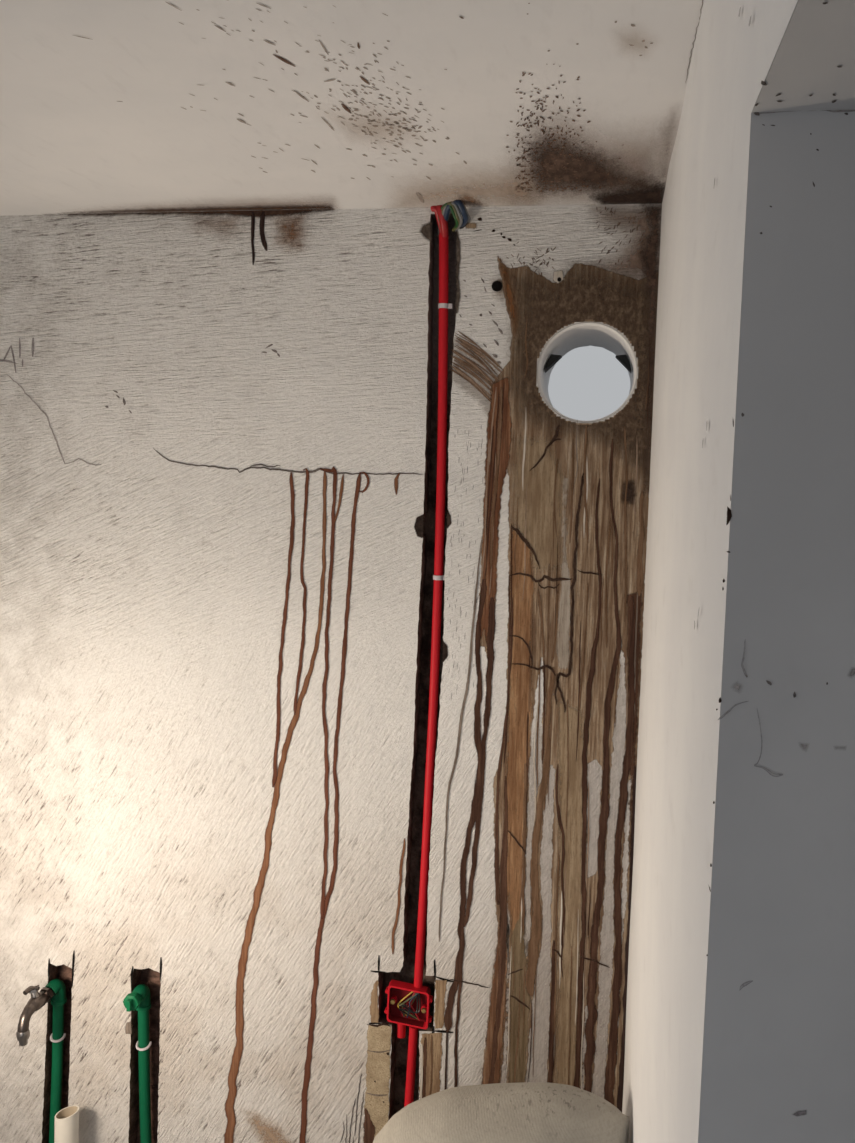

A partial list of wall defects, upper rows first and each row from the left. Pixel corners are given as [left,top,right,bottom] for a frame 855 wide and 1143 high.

water stain [212,3,297,75]
water stain [291,35,449,180]
water stain [69,206,333,265]
crack [8,375,102,466]
crack [154,449,422,475]
crack [530,424,561,471]
water stain [417,64,665,1112]
crack [509,473,602,712]
rust [224,466,370,1143]